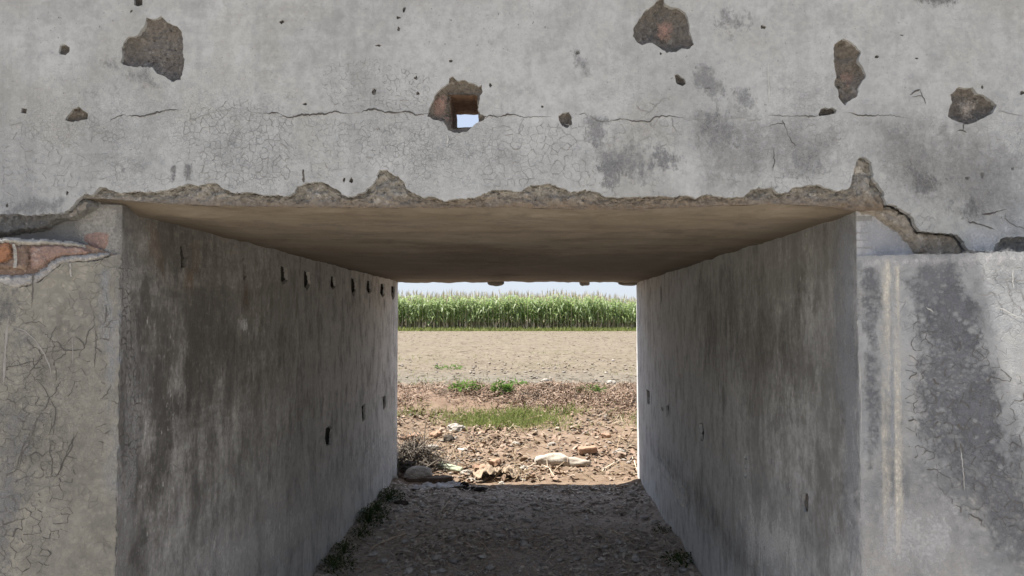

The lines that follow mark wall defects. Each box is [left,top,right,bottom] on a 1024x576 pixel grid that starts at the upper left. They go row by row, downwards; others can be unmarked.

spalling [122,18,185,82]
crack [1,58,440,206]
spalling [428,77,492,133]
spalling [633,0,693,55]
crack [482,89,926,188]
spalling [818,40,865,116]
spalling [948,86,994,125]
spalling [0,159,962,288]
crack [967,267,1024,314]
crack [0,258,142,576]
leakage [836,220,1022,572]
crack [904,313,1024,537]